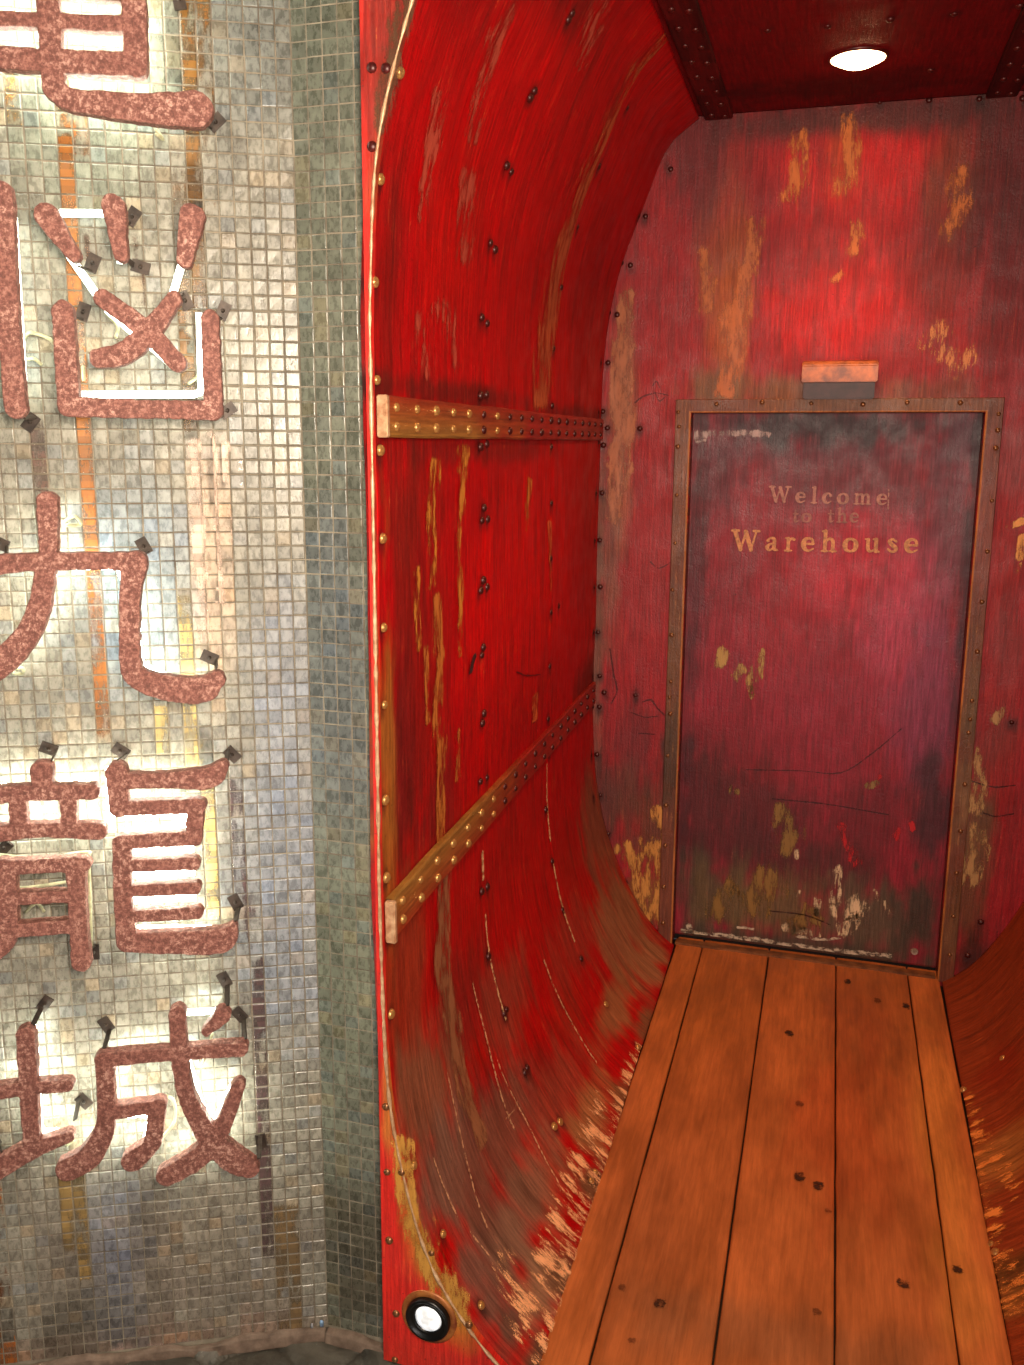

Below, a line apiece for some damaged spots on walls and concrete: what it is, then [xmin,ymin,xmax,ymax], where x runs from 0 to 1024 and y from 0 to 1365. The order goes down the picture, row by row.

rust [180,0,214,106]
rust [58,108,90,393]
rust [173,130,206,209]
rust [178,232,207,400]
peeling [918,321,977,375]
peeling [945,165,972,242]
rust [76,417,99,552]
rust [86,570,110,737]
peeling [714,646,765,700]
peeling [705,801,890,937]
peeling [492,1043,642,1364]
peeling [964,1092,1024,1317]